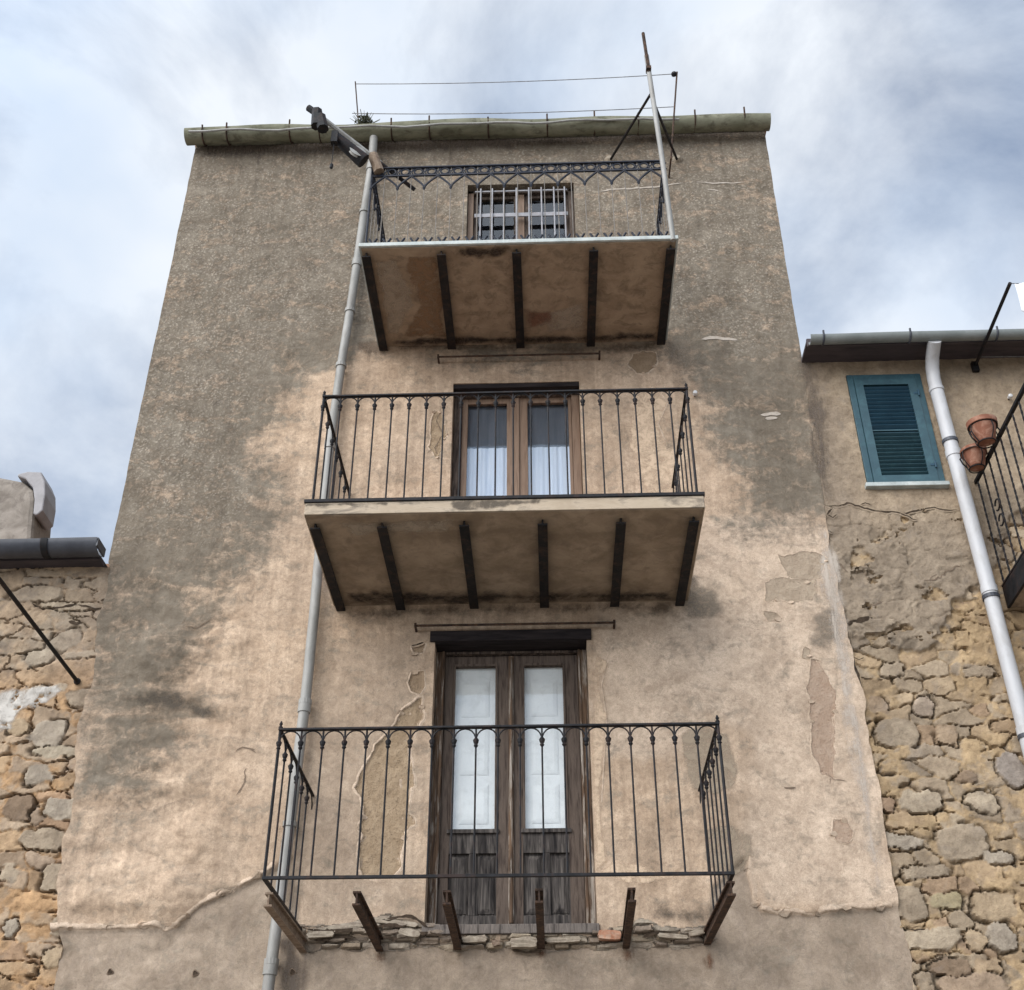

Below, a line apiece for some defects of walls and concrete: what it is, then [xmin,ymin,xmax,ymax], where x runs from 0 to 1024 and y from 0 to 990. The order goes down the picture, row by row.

damp [461,248,505,257]
damp [378,257,653,352]
peeling [427,409,448,459]
crack [824,501,959,572]
damp [350,592,669,617]
peeling [762,550,828,622]
damp [146,693,210,716]
spalling [801,646,838,780]
spalling [352,669,427,881]
peeling [50,862,275,932]